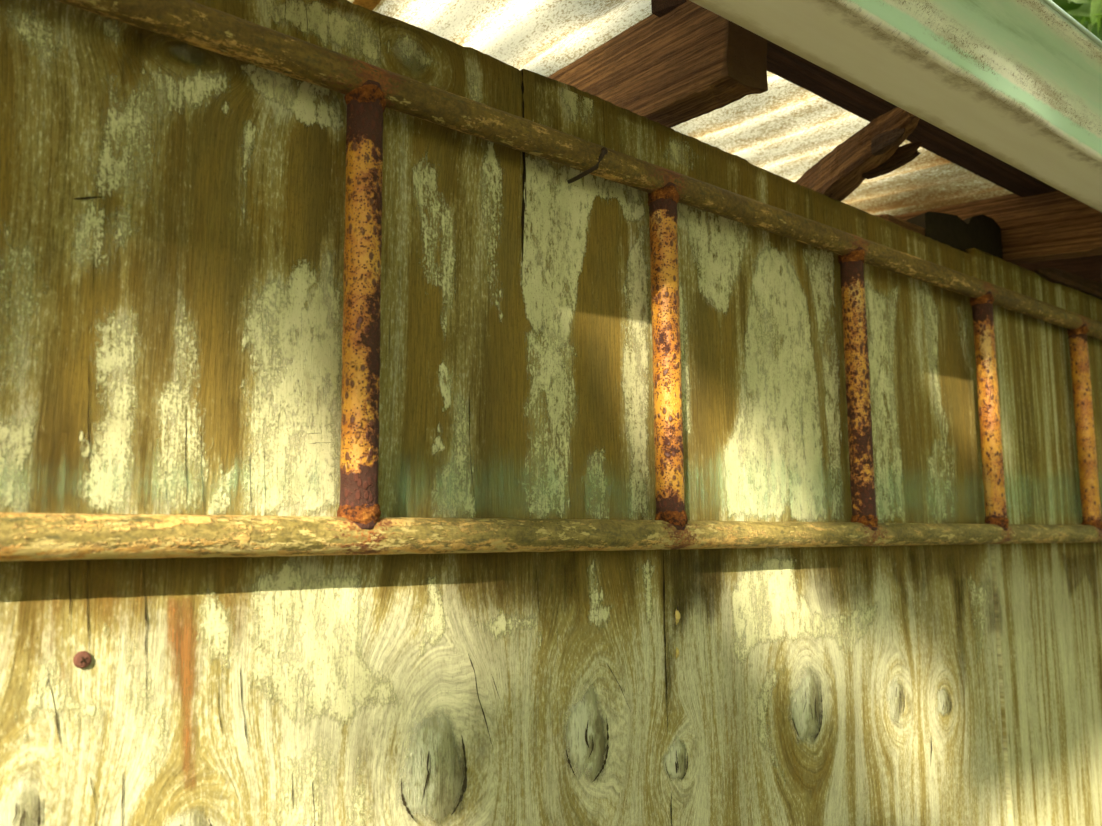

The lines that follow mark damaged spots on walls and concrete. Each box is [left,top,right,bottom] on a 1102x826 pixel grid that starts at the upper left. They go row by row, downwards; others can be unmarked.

crack [518,70,526,118]
crack [519,152,527,263]
rust [168,601,196,770]